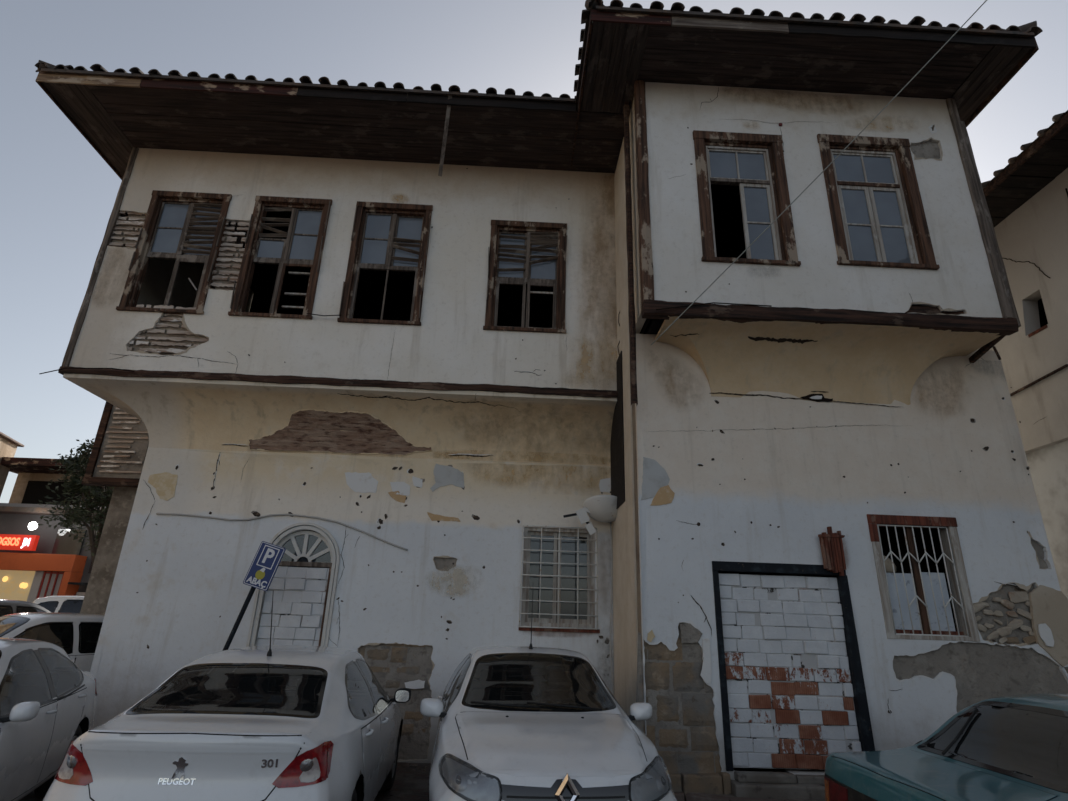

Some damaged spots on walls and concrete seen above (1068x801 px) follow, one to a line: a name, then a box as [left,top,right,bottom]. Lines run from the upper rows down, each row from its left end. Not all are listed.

flaking render [910,137,943,161]
crack [748,336,817,344]
crack [694,391,910,431]
peeling [345,466,425,513]
peeling [650,485,675,506]
flaking render [1027,530,1052,569]
flaking render [892,582,1068,713]
flaking render [357,642,435,761]
flaking render [635,621,723,774]